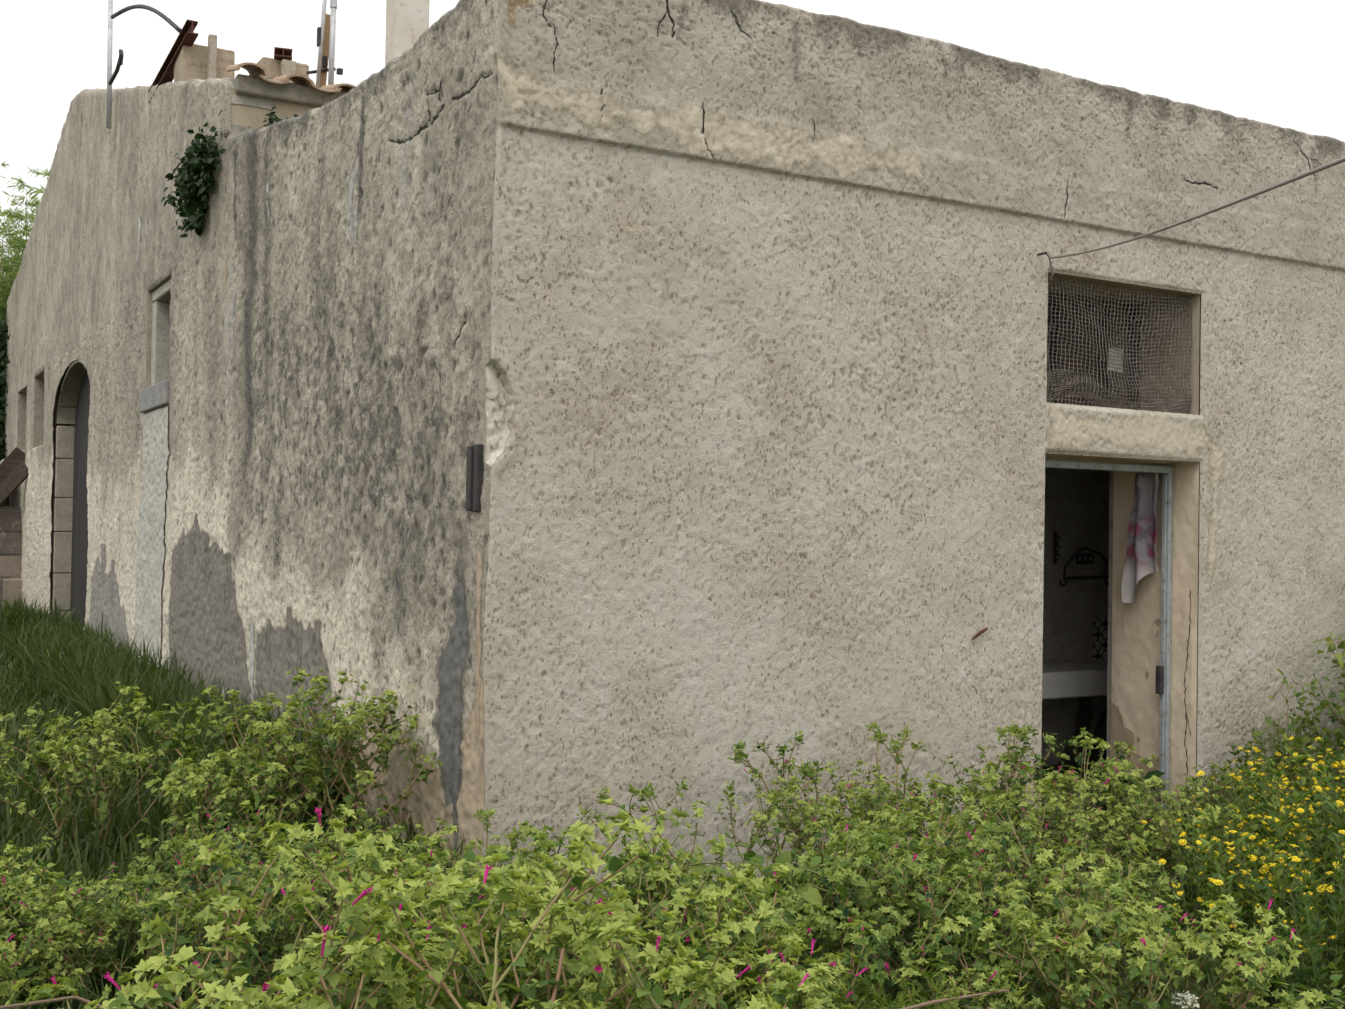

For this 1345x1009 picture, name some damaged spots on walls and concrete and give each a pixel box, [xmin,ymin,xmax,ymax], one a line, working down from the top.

crack [543,0,559,73]
crack [657,0,675,38]
crack [389,72,492,144]
damp [168,61,485,881]
damp [89,544,130,651]